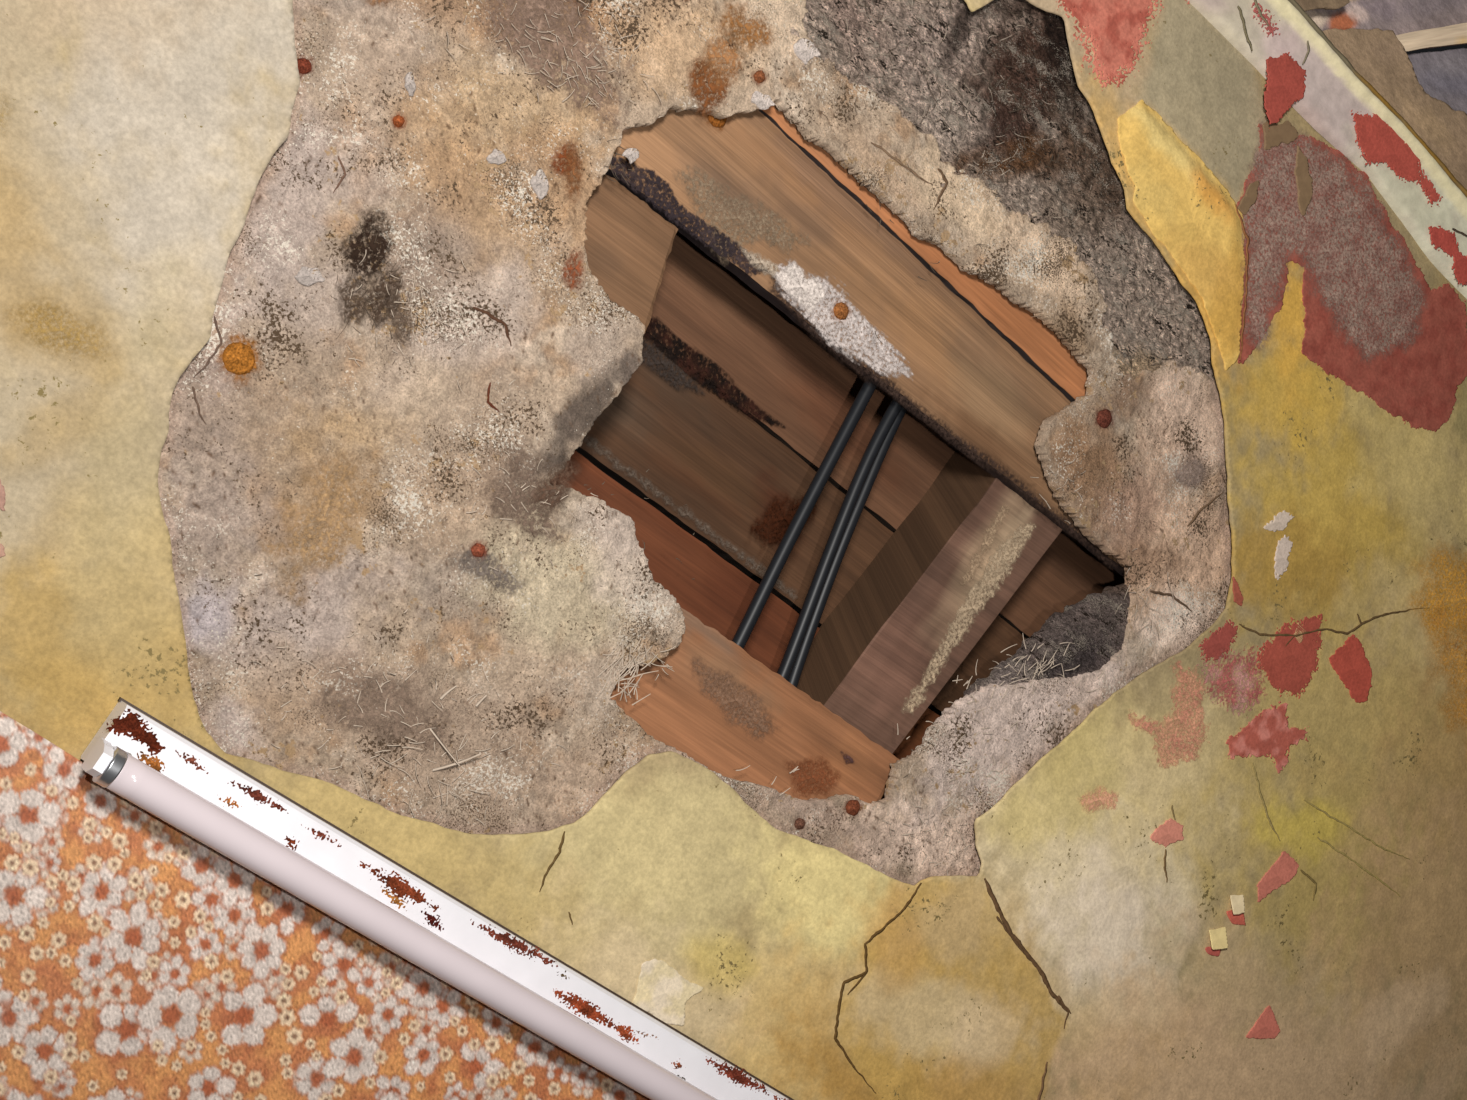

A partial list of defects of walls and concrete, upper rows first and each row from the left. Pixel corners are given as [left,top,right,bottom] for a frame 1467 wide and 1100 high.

mould [338,213,412,344]
flaking render [158,0,1372,885]
damp [610,157,1117,567]
peeling [1237,52,1467,432]
crack [1239,608,1422,646]
crack [834,883,922,1093]
crack [984,878,1071,1029]
crack [1037,1062,1048,1100]